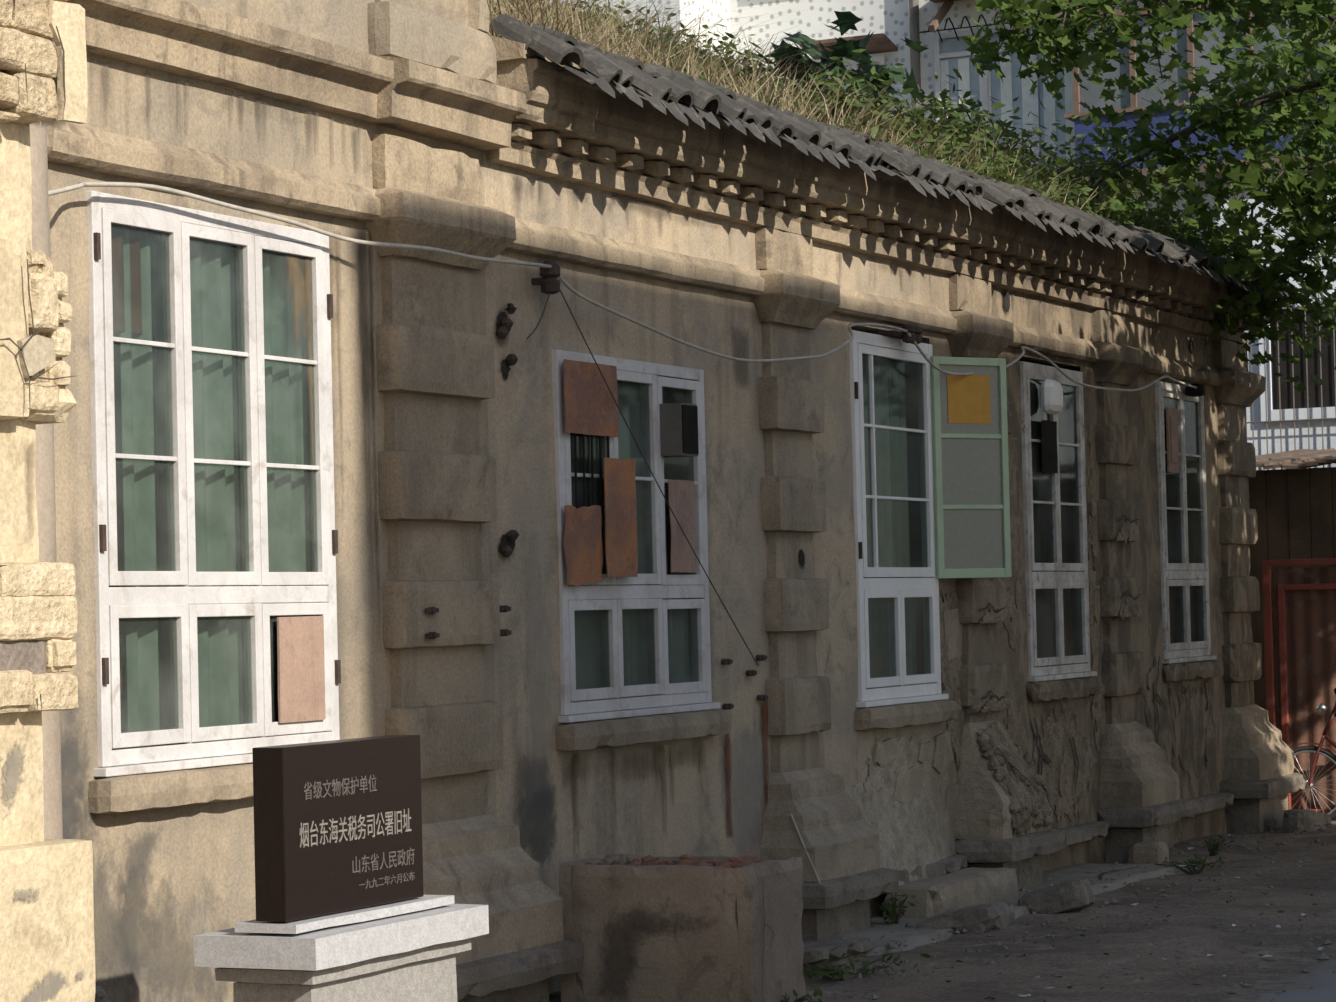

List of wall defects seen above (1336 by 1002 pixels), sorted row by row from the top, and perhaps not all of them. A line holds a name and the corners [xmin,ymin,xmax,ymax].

crack [0,259,75,405]
spalling [939,398,1104,836]
peeling [0,743,25,816]
peeling [15,887,40,901]
peeling [23,971,112,1002]